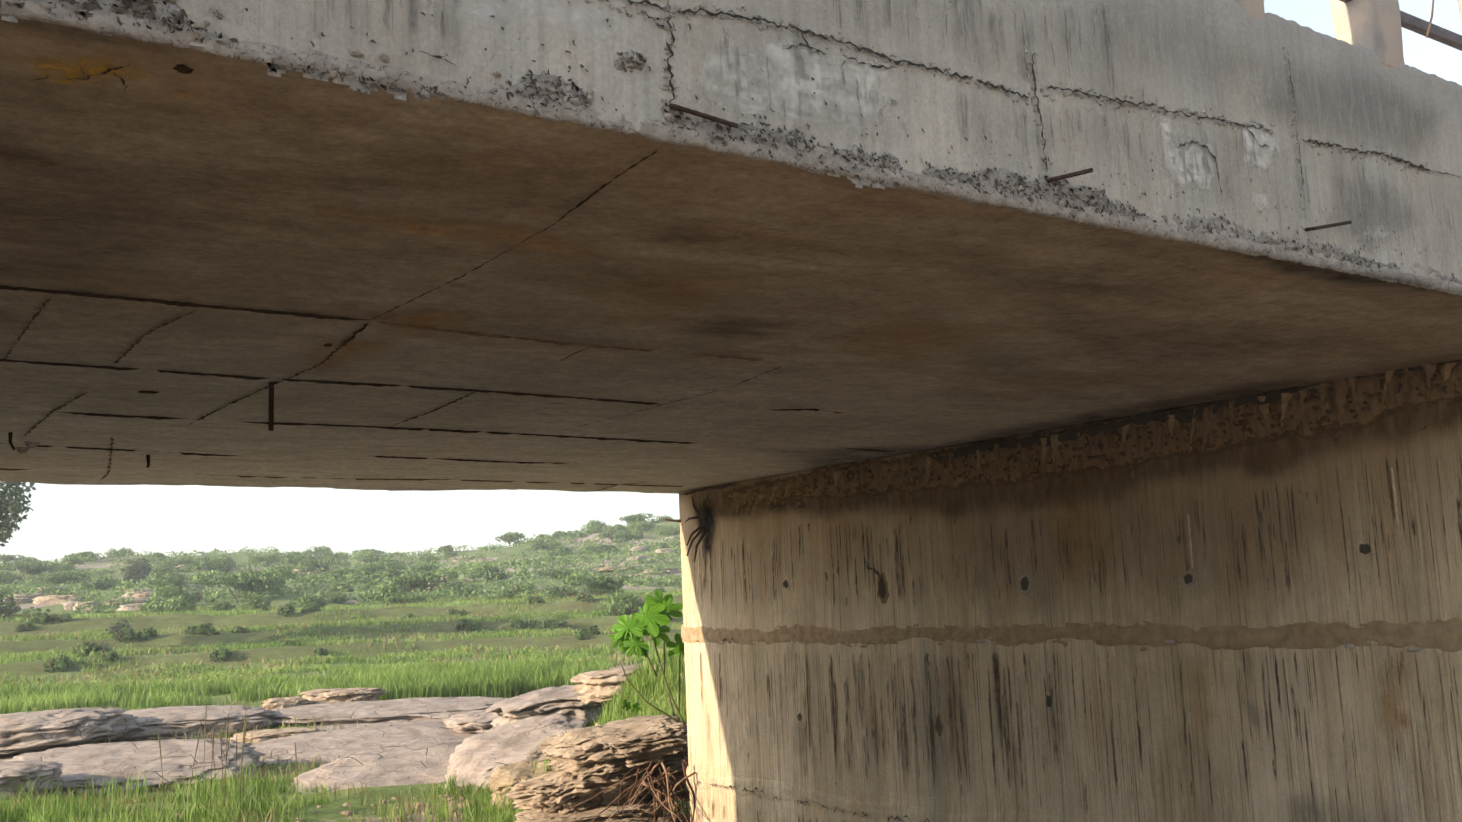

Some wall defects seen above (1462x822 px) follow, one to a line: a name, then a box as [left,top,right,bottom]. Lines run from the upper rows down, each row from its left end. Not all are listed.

spalling [0,0,1462,296]
crack [585,0,1458,194]
water stain [700,652,1154,806]
water stain [1166,654,1224,802]
water stain [1262,654,1317,795]
water stain [1397,653,1458,726]